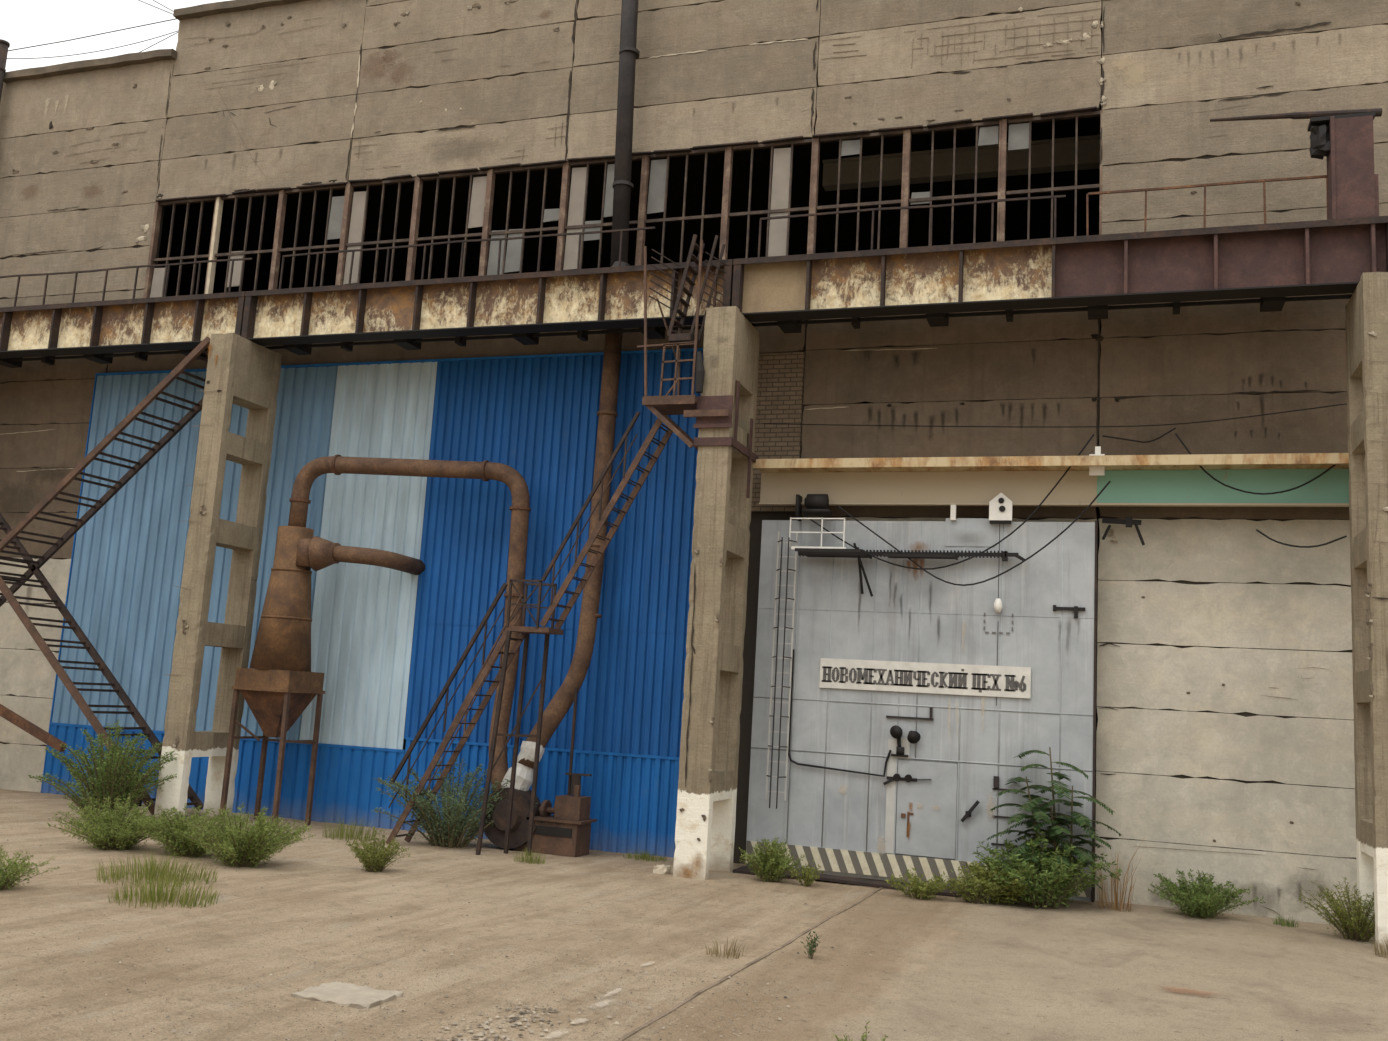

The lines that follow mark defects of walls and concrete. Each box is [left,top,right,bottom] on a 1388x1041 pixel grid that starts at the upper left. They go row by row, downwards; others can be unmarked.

crack [501,0,577,155]
crack [435,124,475,132]
crack [345,131,381,178]